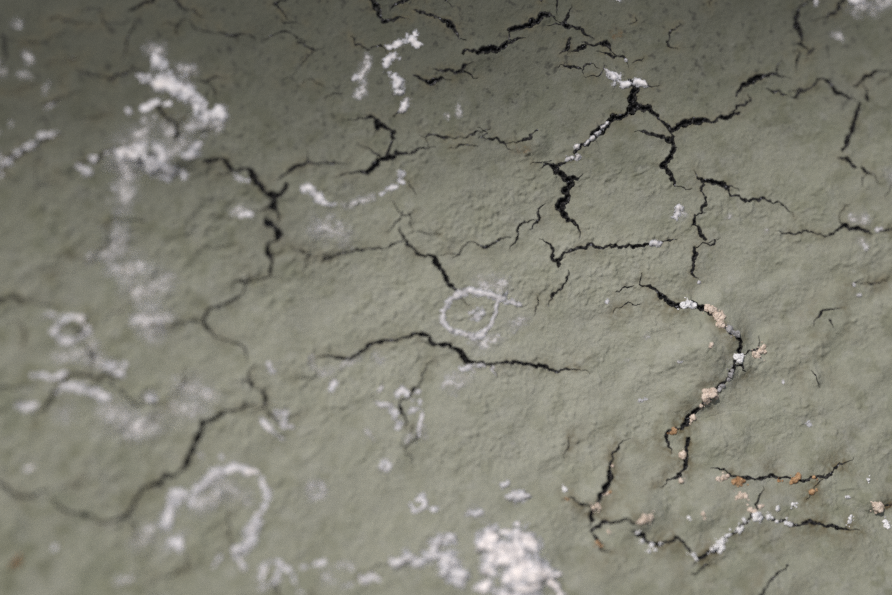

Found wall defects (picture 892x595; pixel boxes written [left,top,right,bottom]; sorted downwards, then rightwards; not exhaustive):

damp [382,30,423,113]
crack [369,0,644,86]
damp [76,46,228,341]
crack [532,0,892,316]
damp [30,311,217,446]
crack [0,115,545,538]
crack [297,331,590,467]
damp [439,275,522,349]
crack [613,273,760,488]
damp [128,454,272,571]
damp [388,521,567,595]
crack [563,438,858,575]